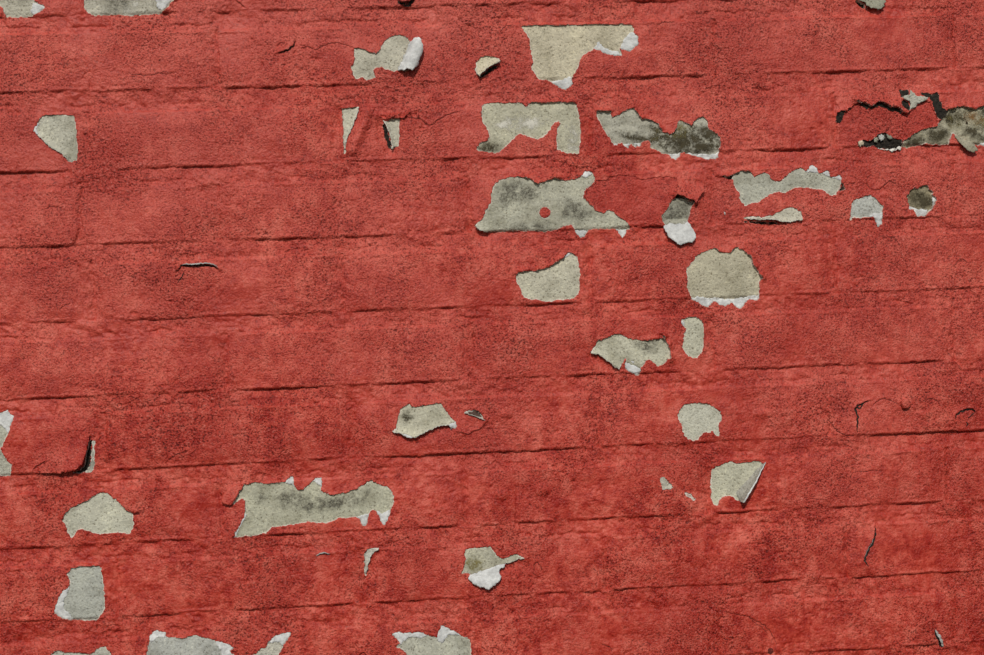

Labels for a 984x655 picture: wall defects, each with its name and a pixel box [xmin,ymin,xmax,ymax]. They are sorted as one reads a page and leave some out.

peeling [522,24,639,90]
peeling [475,171,630,238]
peeling [722,165,844,225]
peeling [516,253,581,302]
peeling [686,247,761,309]
peeling [591,334,670,376]
peeling [62,492,139,538]
peeling [221,476,394,538]
peeling [710,461,766,506]
peeling [54,566,105,621]
peeling [147,630,234,655]
peeling [392,625,472,655]